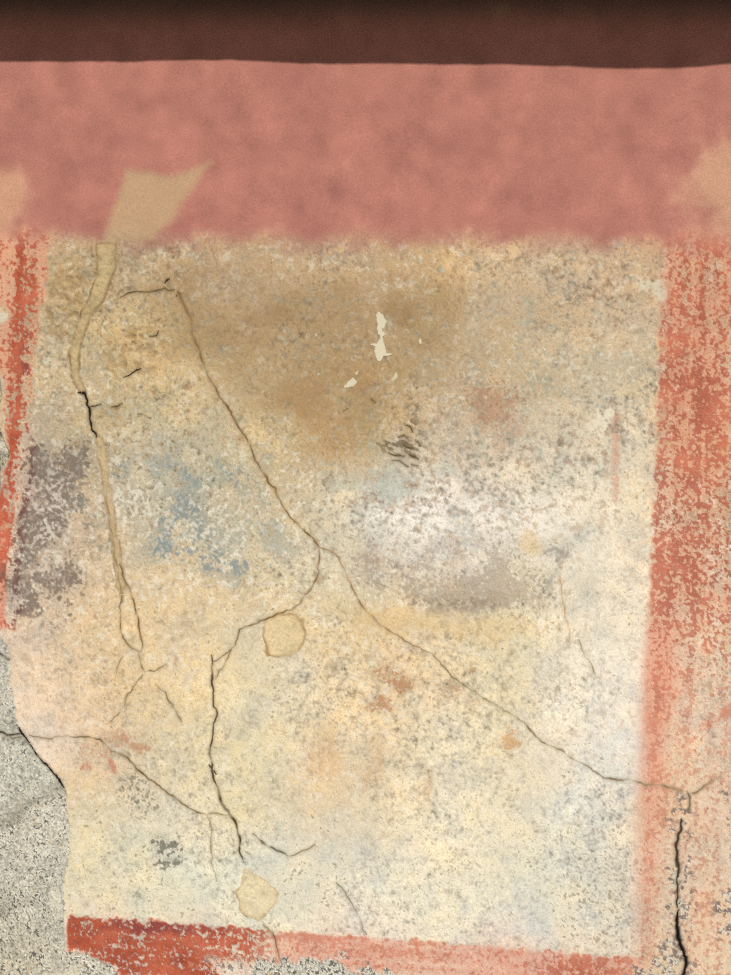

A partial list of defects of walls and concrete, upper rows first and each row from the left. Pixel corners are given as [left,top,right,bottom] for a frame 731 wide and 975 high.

flaking render [0,427,10,460]
flaking render [348,408,443,469]
crack [0,276,724,975]
flaking render [0,634,118,975]
flaking render [105,752,198,876]
flaking render [243,957,387,975]